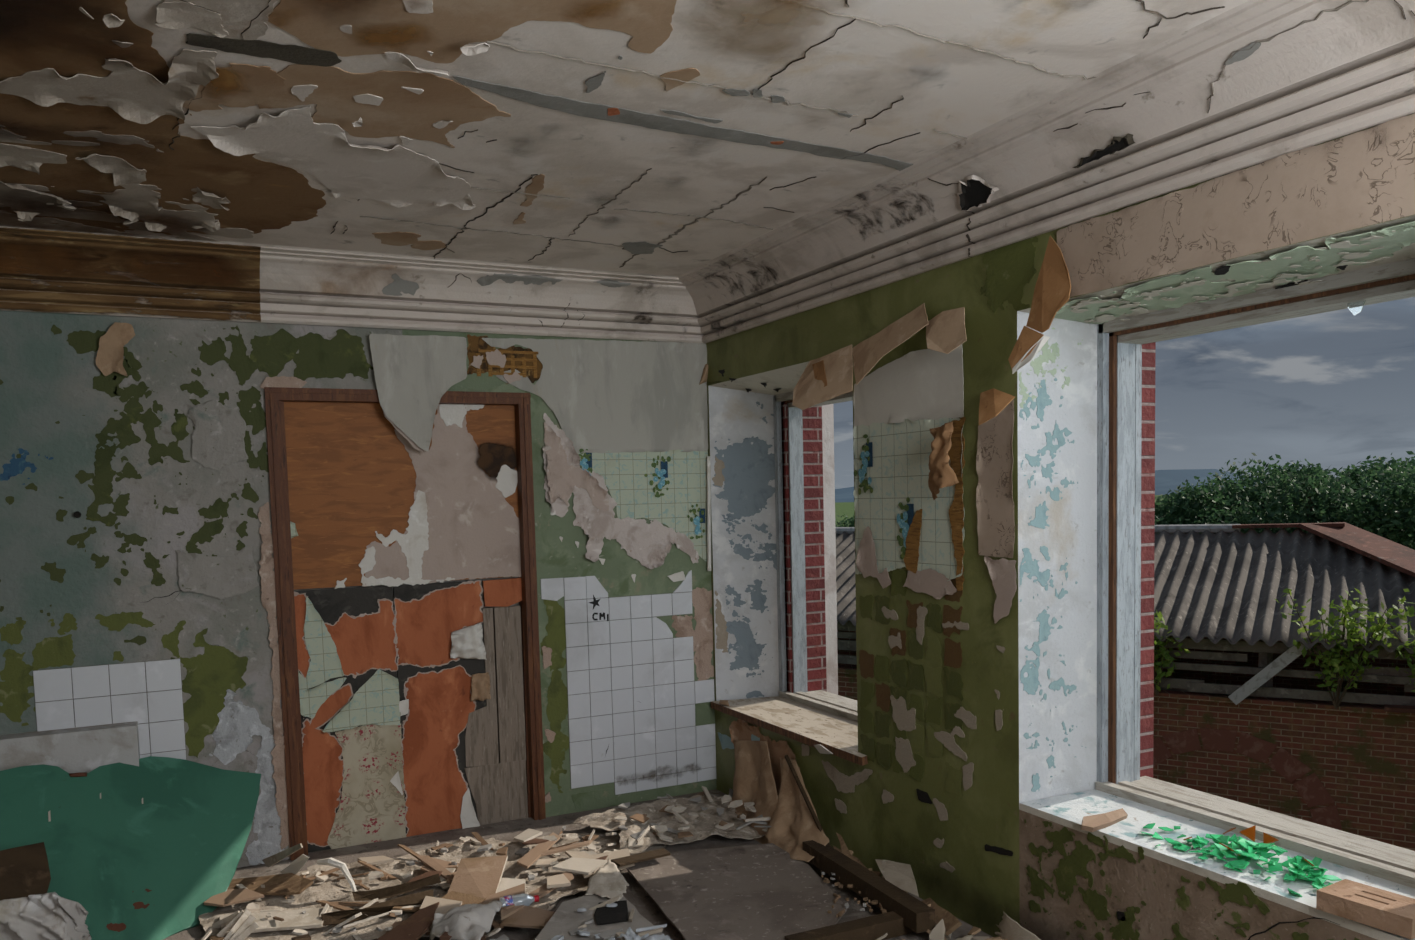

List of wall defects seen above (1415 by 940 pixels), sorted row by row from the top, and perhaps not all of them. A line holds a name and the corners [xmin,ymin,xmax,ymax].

peeling [0,0,677,242]
crack [752,0,856,95]
crack [1053,75,1149,132]
crack [1135,0,1225,39]
crack [1207,0,1415,113]
crack [331,95,967,287]
crack [928,178,975,257]
peeling [1019,221,1415,529]
peeling [672,369,781,698]
peeling [51,324,373,865]
peeling [0,605,78,726]
peeling [985,820,1146,940]